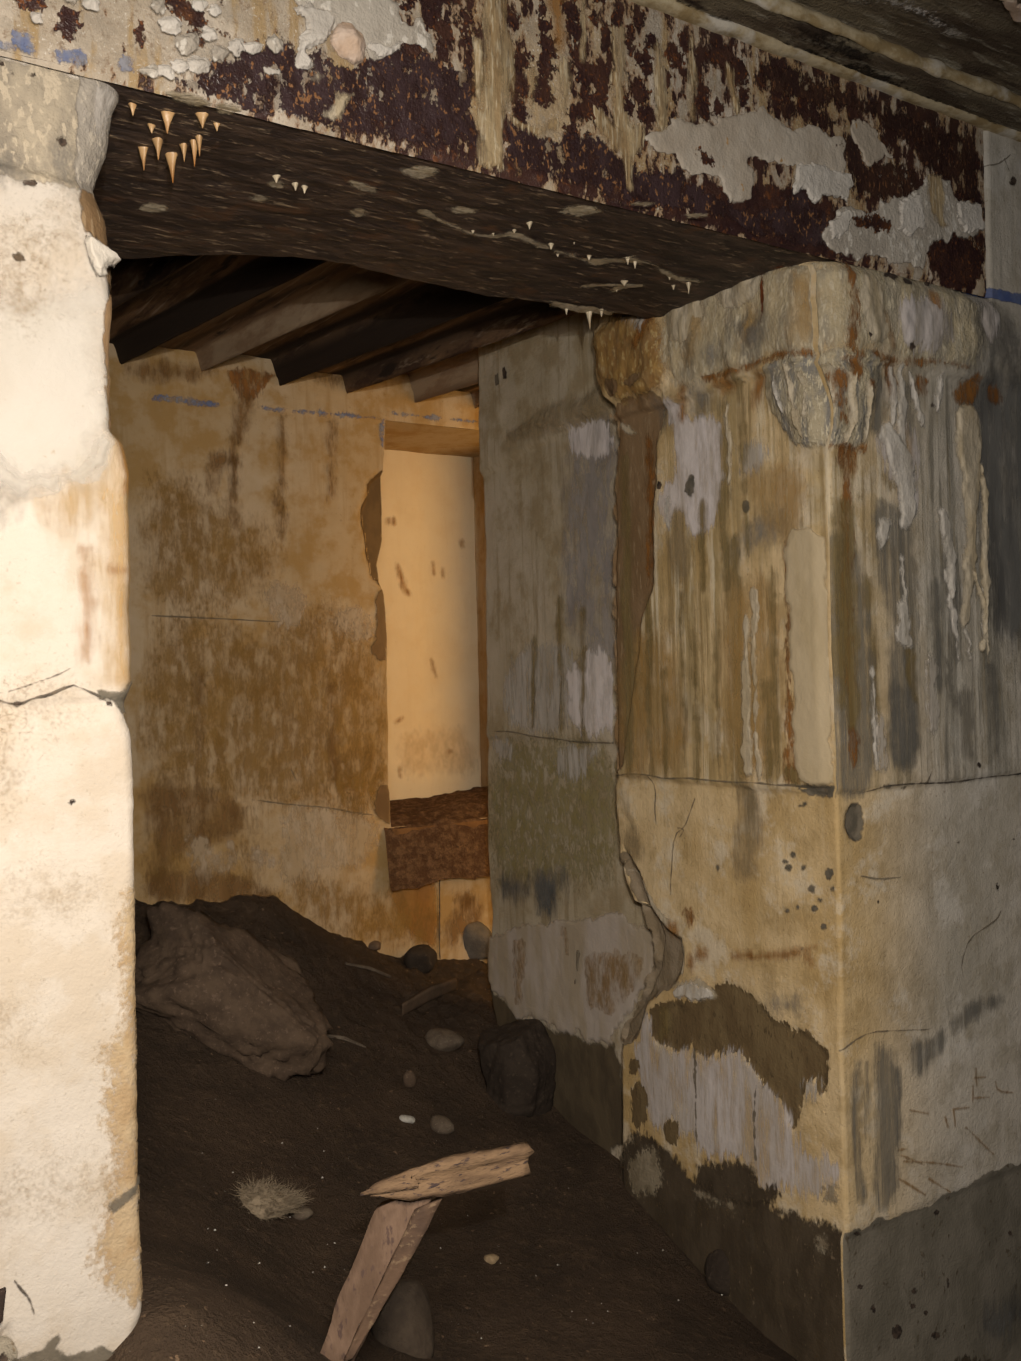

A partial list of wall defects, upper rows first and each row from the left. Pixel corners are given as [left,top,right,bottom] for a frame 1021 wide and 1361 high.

rust [16,0,84,43]
rust [164,0,485,149]
peeling [295,0,434,77]
rust [501,0,979,248]
peeling [593,104,985,269]
rust [929,235,985,288]
water stain [662,262,1021,797]
crack [0,674,112,707]
water stain [96,611,384,1307]
peeling [488,852,834,1131]
water stain [545,1027,1021,1361]
spalling [0,1336,114,1361]